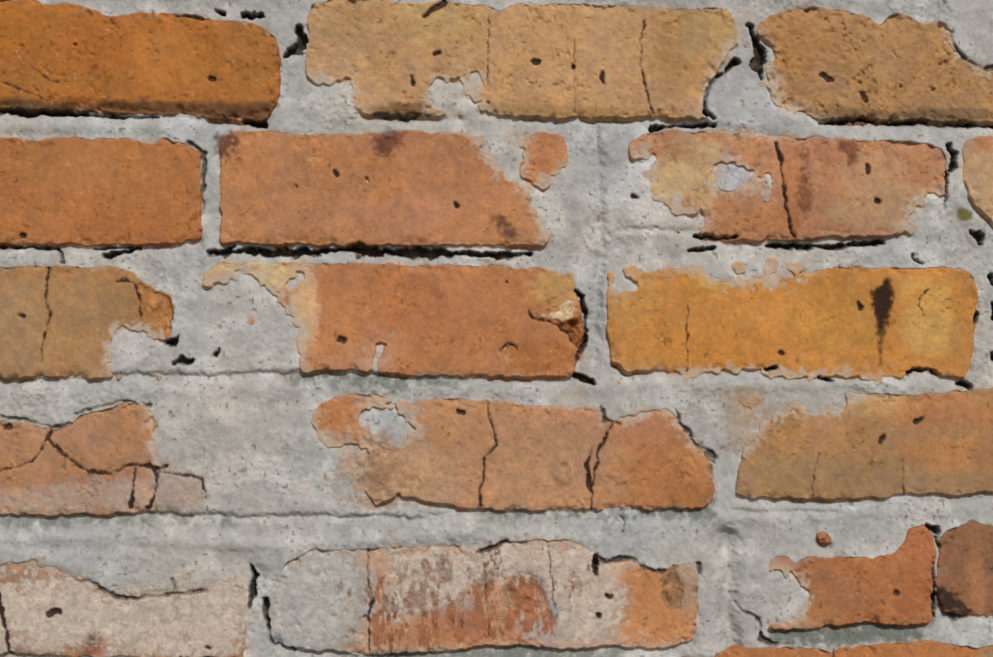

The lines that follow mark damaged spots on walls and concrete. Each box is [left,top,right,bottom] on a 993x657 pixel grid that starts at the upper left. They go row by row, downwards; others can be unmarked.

crack [775,142,796,238]
crack [42,268,52,346]
crack [4,429,206,510]
crack [479,403,497,507]
crack [584,423,613,509]
crack [0,593,12,652]